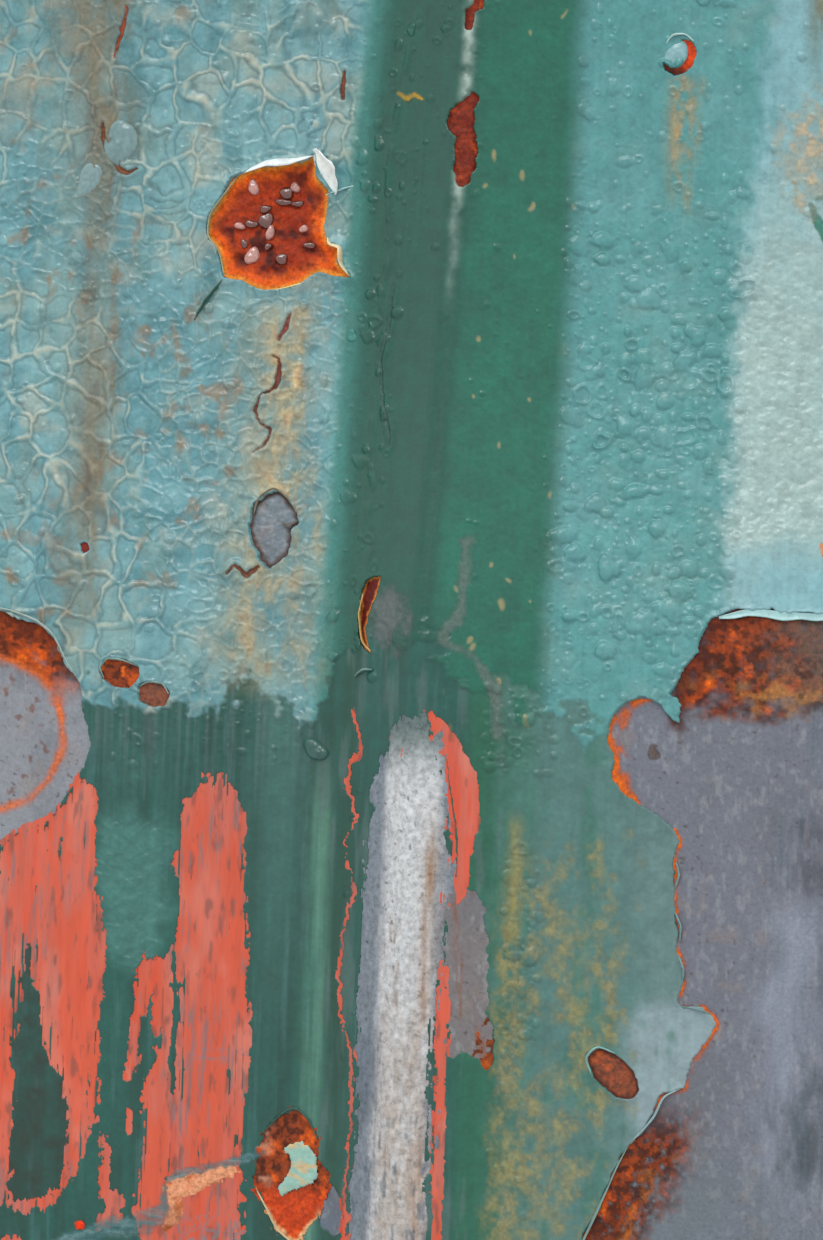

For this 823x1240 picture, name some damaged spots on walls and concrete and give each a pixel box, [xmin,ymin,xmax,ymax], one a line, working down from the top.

crack [101,123,138,175]
crack [114,6,128,58]
crack [339,71,347,100]
corrosion [194,148,354,320]
crack [254,314,291,450]
peeling [0,607,91,840]
peeling [319,709,495,1240]
peeling [582,609,823,1240]
peeling [162,1162,241,1232]
corrosion [251,1105,331,1240]